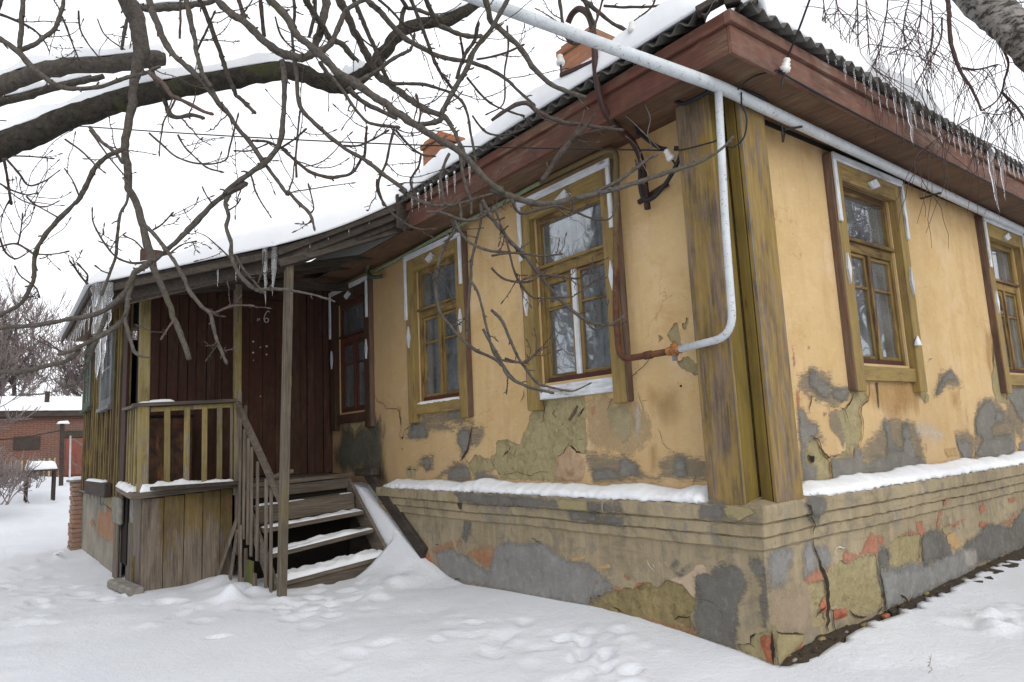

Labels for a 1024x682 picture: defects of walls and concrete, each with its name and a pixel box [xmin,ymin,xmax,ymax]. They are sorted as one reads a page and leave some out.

peeling [659,318,698,376]
peeling [466,394,651,482]
peeling [804,438,830,480]
peeling [588,580,699,637]
peeling [738,533,920,666]
crack [770,505,908,665]